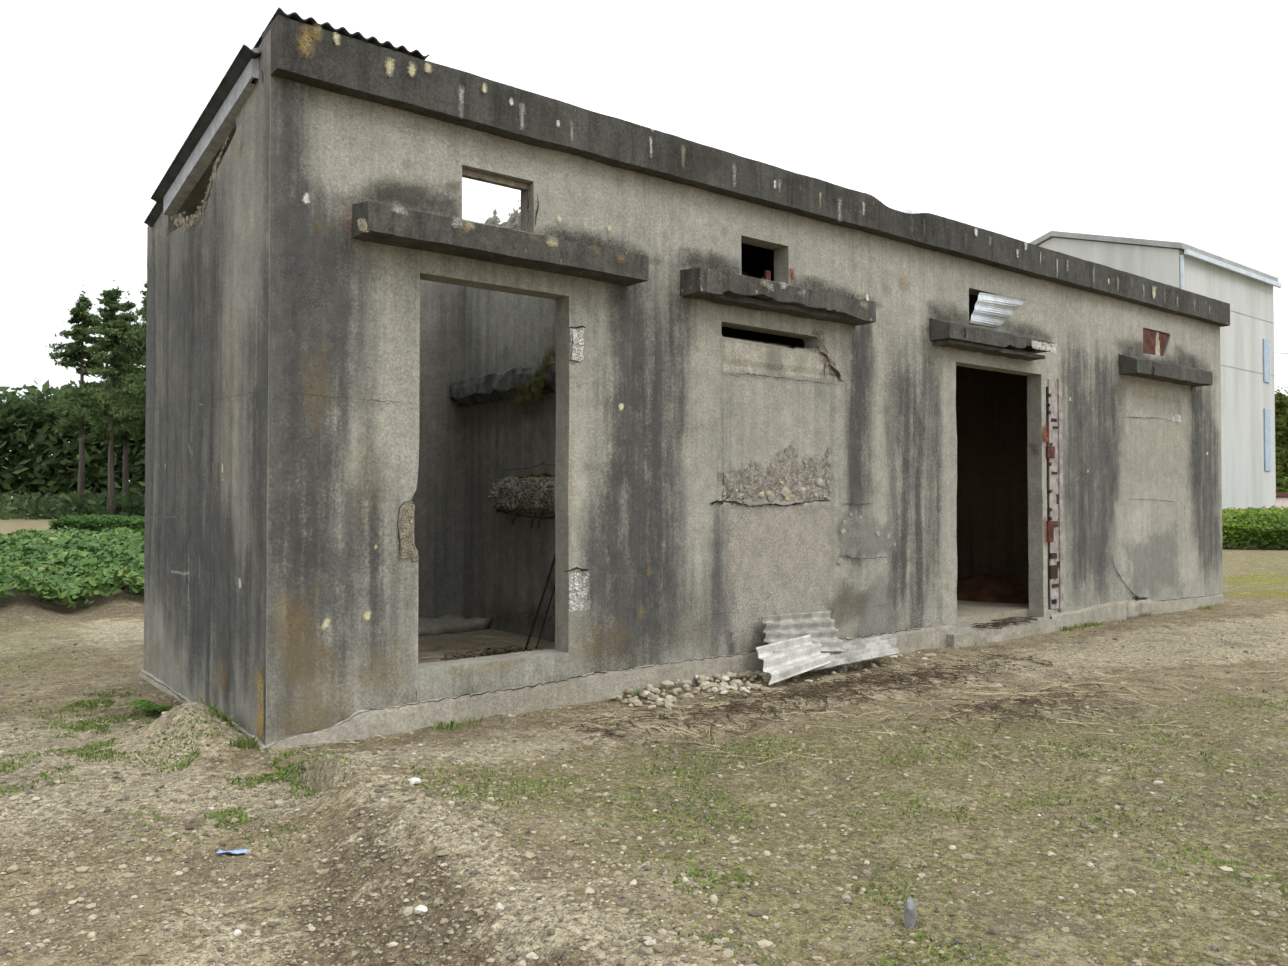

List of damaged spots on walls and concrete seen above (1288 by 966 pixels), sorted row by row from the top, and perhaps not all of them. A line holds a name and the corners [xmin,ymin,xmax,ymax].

spalling [170,136,230,232]
damp [357,182,458,218]
damp [144,92,384,740]
damp [588,286,689,658]
peeling [717,440,836,644]
crack [730,346,843,386]
damp [1062,348,1116,591]
damp [1191,388,1219,569]